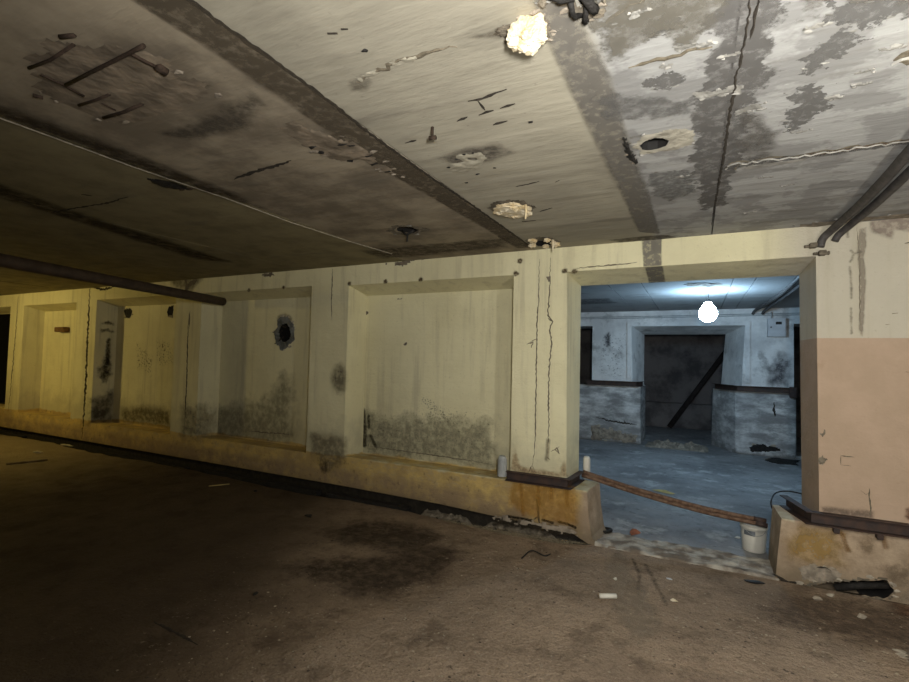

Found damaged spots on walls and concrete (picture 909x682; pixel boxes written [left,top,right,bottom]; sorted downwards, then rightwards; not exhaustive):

peeling [627,7,653,20]
spalling [23,33,222,124]
peeling [642,63,686,90]
peeling [780,0,909,134]
crack [711,0,760,225]
spalling [446,149,495,183]
spalling [618,133,646,165]
crack [528,259,560,473]
damp [769,355,789,385]
damp [363,410,376,447]
damp [305,522,453,595]
spalling [796,563,901,600]